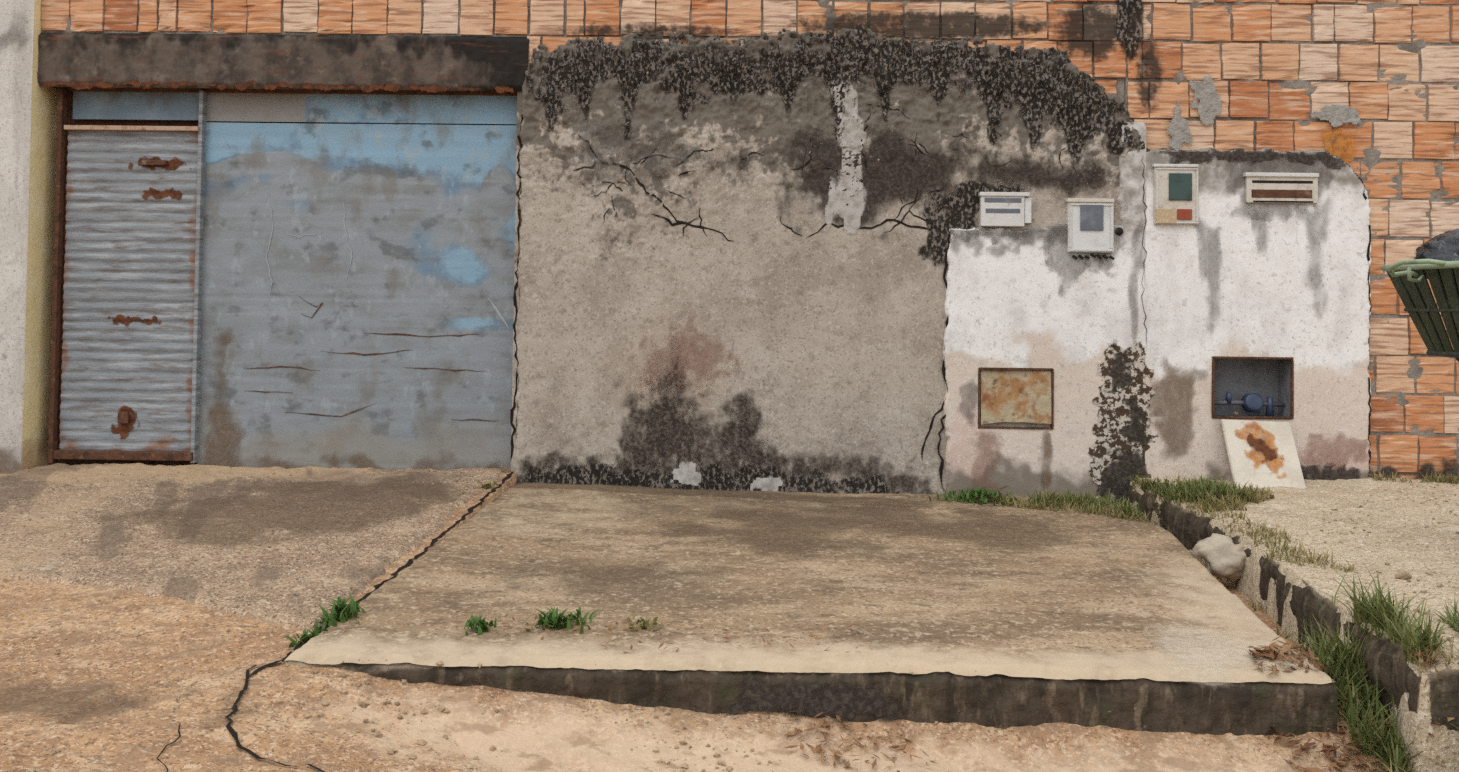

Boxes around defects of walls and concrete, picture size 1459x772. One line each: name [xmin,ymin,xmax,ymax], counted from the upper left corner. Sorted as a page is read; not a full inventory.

rust [128,156,186,200]
rust [107,314,161,326]
crack [574,104,1023,491]
leakage [503,360,931,494]
rust [1236,422,1285,475]